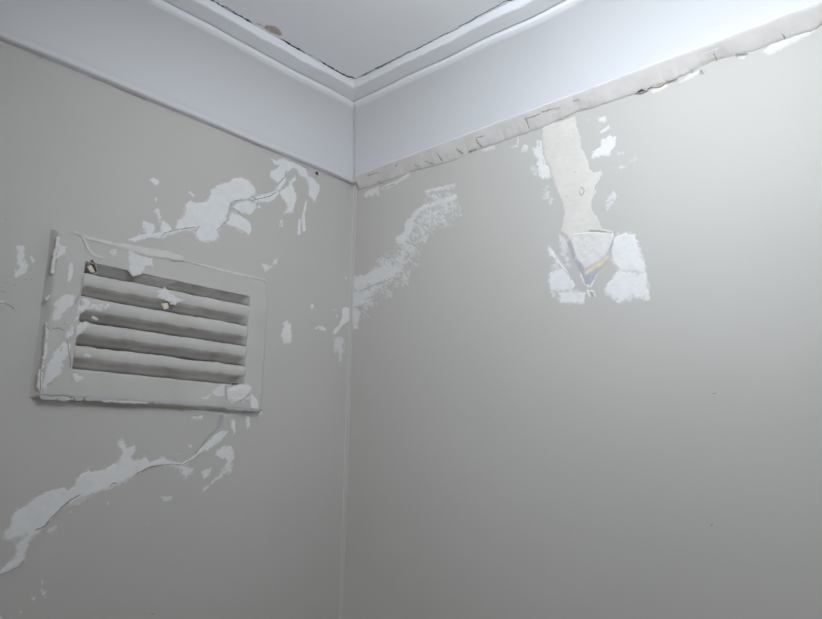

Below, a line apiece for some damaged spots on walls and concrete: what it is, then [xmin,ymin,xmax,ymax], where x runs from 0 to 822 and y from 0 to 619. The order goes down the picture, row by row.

crack [210,0,263,26]
crack [280,0,513,79]
crack [139,101,483,236]
crack [332,183,464,362]
crack [524,99,579,129]
peeling [541,116,614,298]
crack [0,385,262,577]